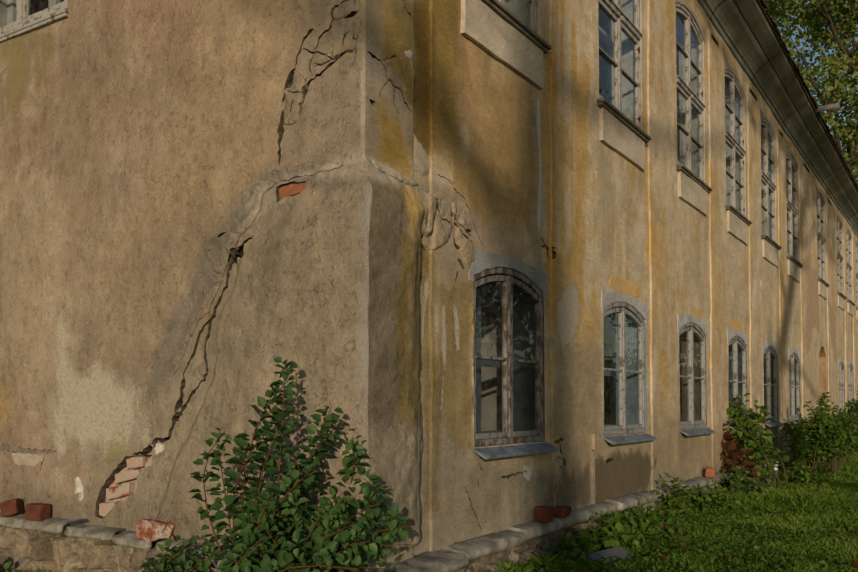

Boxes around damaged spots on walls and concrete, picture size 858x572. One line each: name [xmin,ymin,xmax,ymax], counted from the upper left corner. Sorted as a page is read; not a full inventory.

crack [277,0,411,166]
peeling [250,162,343,202]
peeling [204,230,240,276]
crack [421,174,482,283]
crack [133,235,254,457]
peeling [0,444,58,467]
spalling [95,443,164,519]